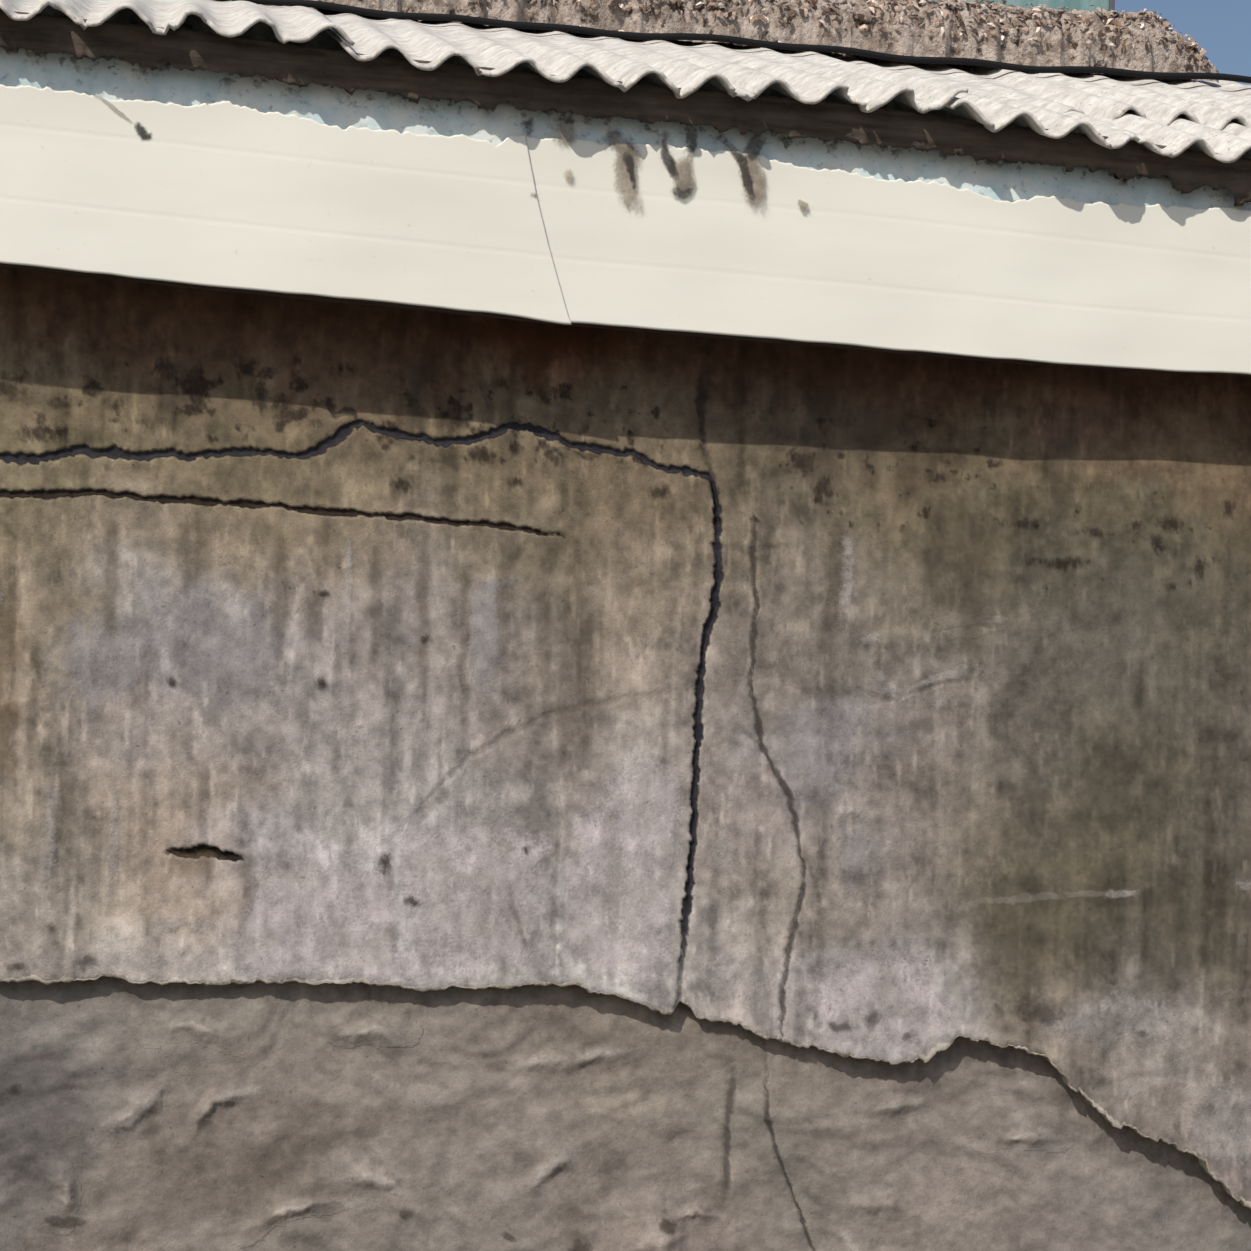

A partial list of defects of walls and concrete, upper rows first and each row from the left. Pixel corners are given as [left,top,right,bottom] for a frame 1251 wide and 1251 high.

leakage [23,380,102,438]
leakage [155,359,223,415]
leakage [239,359,334,431]
leakage [438,390,519,461]
crack [696,382,706,436]
leakage [841,540,853,605]
crack [0,407,806,1034]
peeling [0,759,1251,1210]
crack [724,1087,733,1184]
crack [765,1094,815,1250]